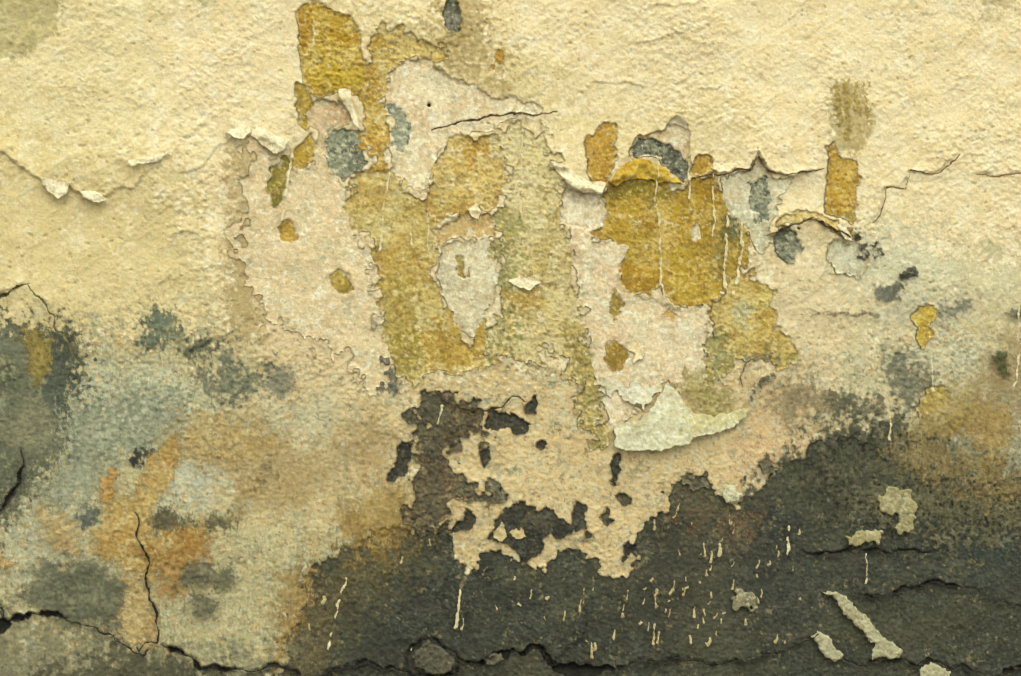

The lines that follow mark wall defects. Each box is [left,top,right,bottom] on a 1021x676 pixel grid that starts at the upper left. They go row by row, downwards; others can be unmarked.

crack [766,217,853,240]
crack [872,154,960,223]
crack [977,171,1021,179]
crack [0,450,25,512]
leakage [0,303,300,553]
leakage [376,356,407,396]
peeling [224,0,1021,676]
leakage [740,338,1021,544]
leakage [0,522,441,676]
crack [0,512,818,676]